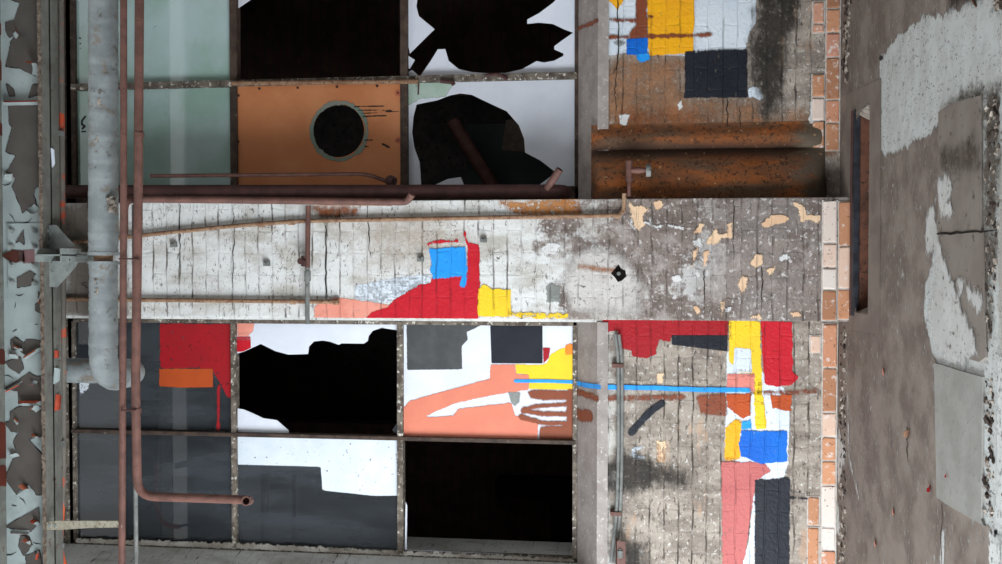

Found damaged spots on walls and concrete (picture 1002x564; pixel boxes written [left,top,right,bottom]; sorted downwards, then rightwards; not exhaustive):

peeling [0,0,55,214]
peeling [17,271,41,313]
peeling [628,199,733,278]
peeling [738,276,748,292]
peeling [750,254,790,275]
peeling [761,0,993,564]